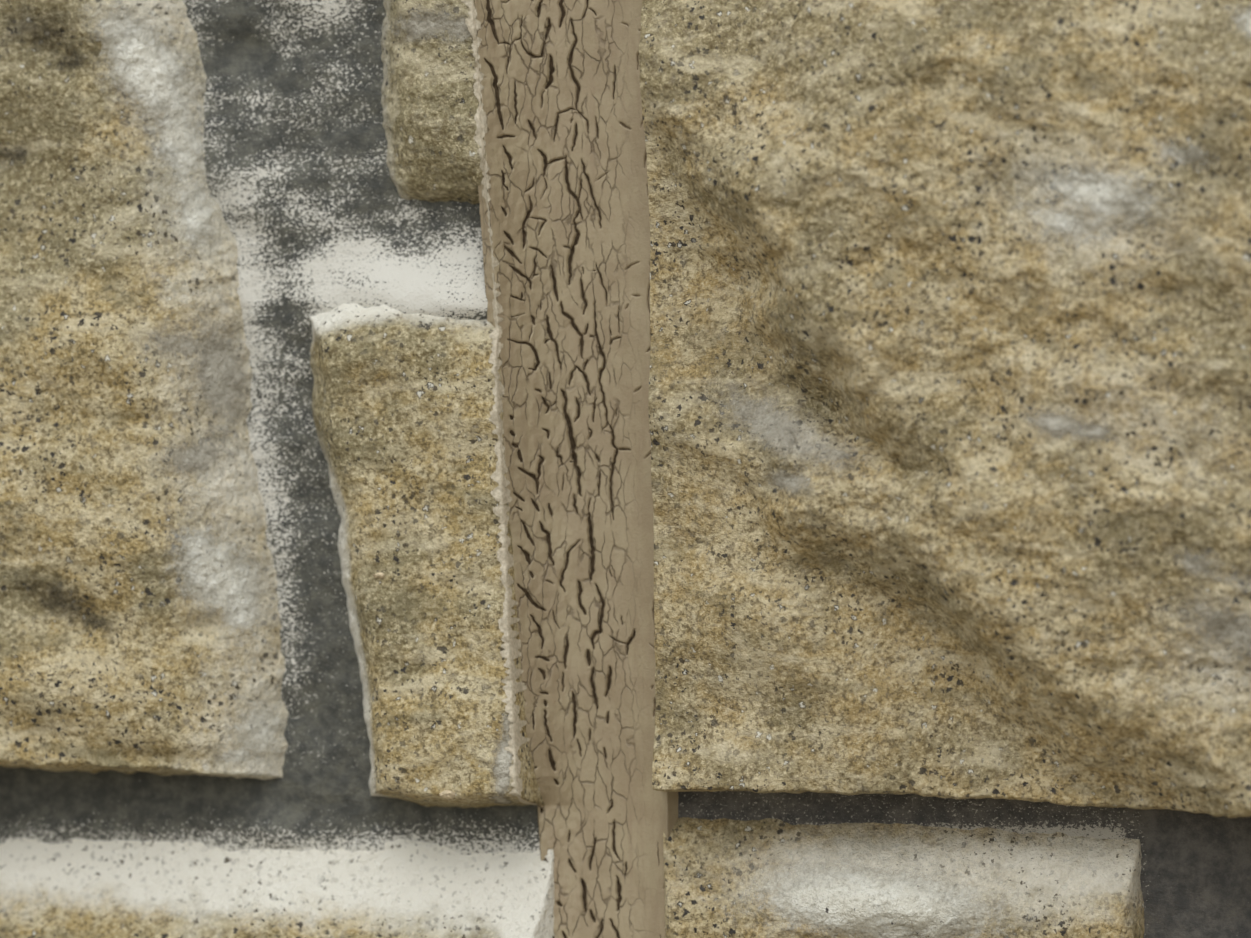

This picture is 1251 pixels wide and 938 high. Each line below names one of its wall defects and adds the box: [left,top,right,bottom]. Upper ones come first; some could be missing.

crack [484,0,655,813]
crack [557,800,627,938]